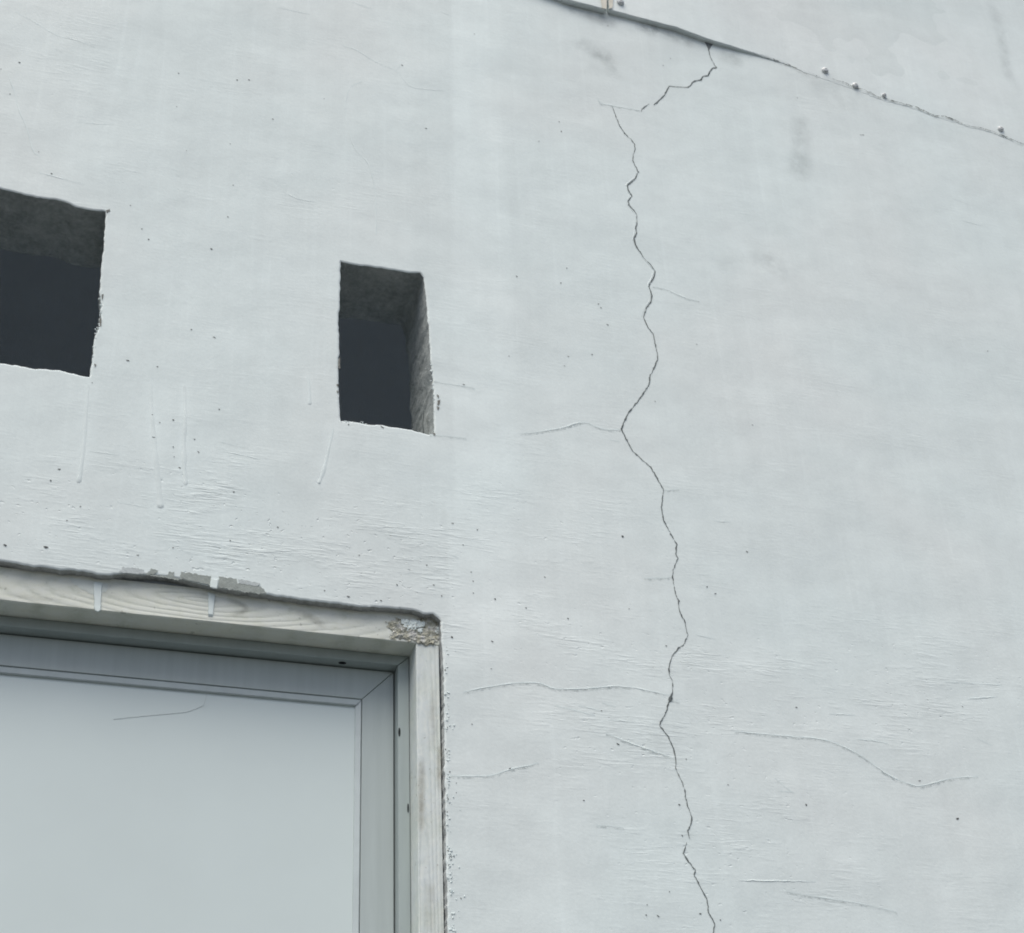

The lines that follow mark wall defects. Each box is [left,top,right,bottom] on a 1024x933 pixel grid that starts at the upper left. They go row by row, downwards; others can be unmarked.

crack [450,42,716,933]
peeling [119,567,266,594]
spalling [385,617,456,673]
crack [735,731,978,788]